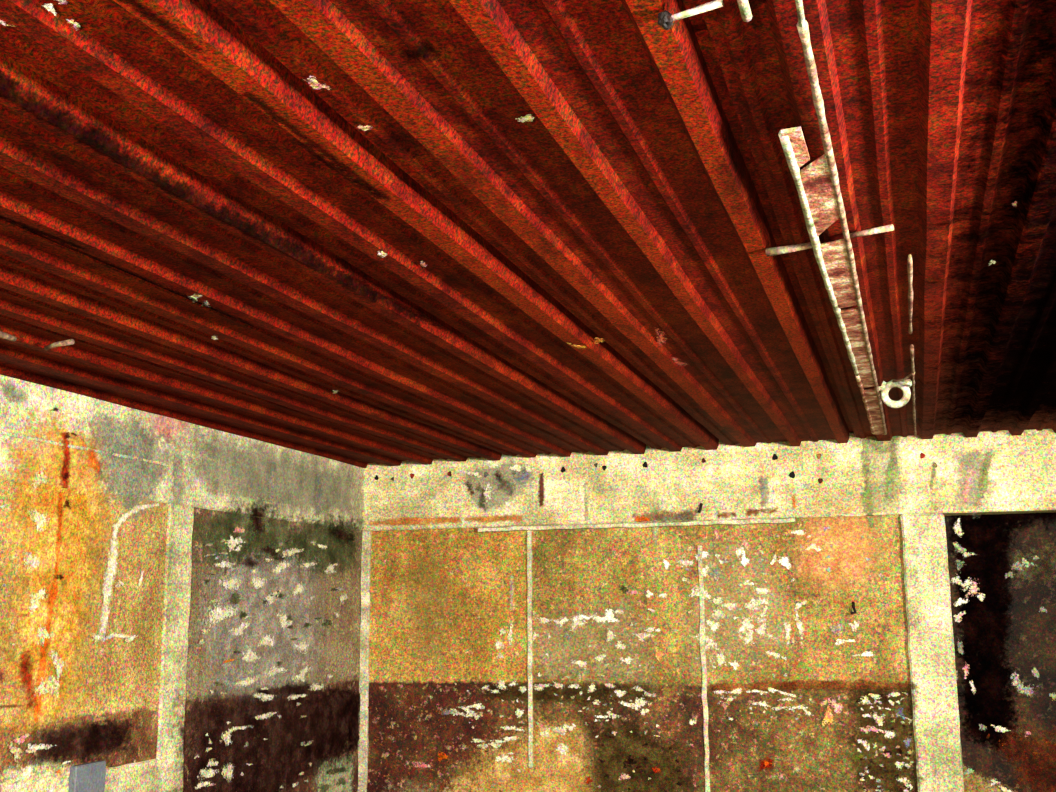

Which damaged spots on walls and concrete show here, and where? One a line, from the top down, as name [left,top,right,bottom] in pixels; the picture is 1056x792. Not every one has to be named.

corrosion [0,408,112,731]
leakage [172,680,360,792]
peeling [197,527,349,696]
peeling [314,754,355,792]
flaking render [408,585,667,792]
peeling [663,539,923,792]